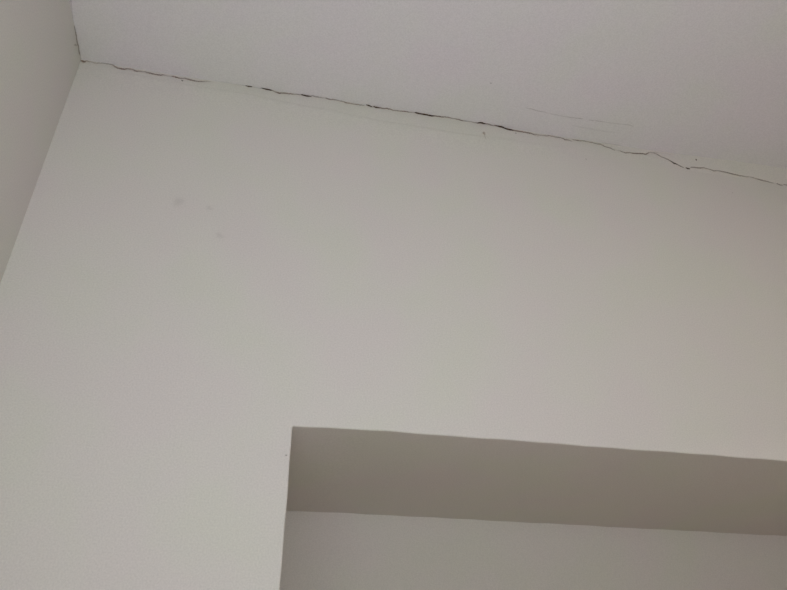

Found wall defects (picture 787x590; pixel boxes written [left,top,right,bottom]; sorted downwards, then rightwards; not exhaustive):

crack [246,86,532,134]